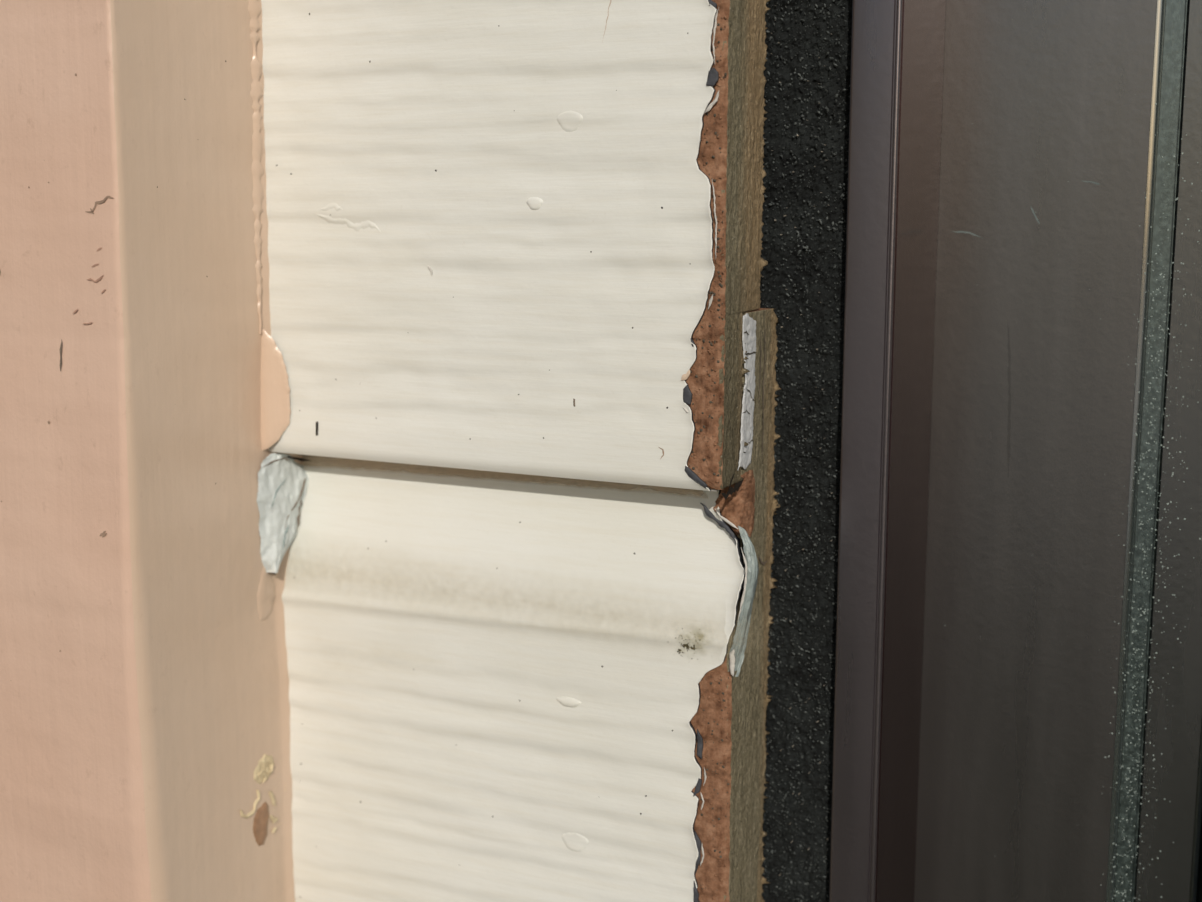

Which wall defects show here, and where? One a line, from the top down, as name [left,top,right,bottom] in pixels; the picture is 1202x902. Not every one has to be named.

peeling [681,0,759,902]